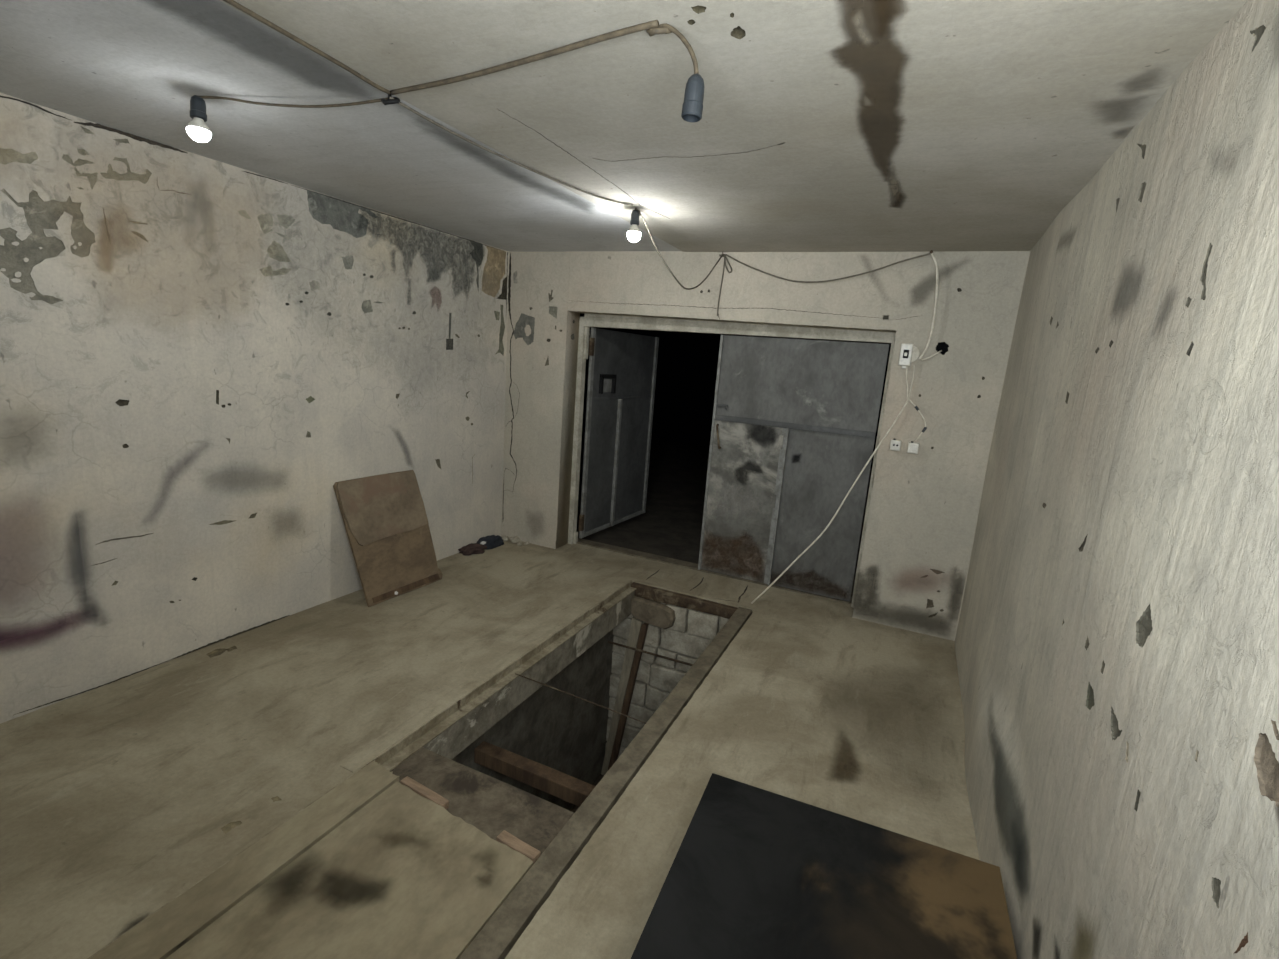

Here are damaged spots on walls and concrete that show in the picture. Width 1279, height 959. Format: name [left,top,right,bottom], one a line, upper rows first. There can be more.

leakage [834,0,907,208]
peeling [0,138,152,304]
leakage [854,570,962,631]
spalling [1136,604,1153,647]
spalling [1254,720,1279,807]